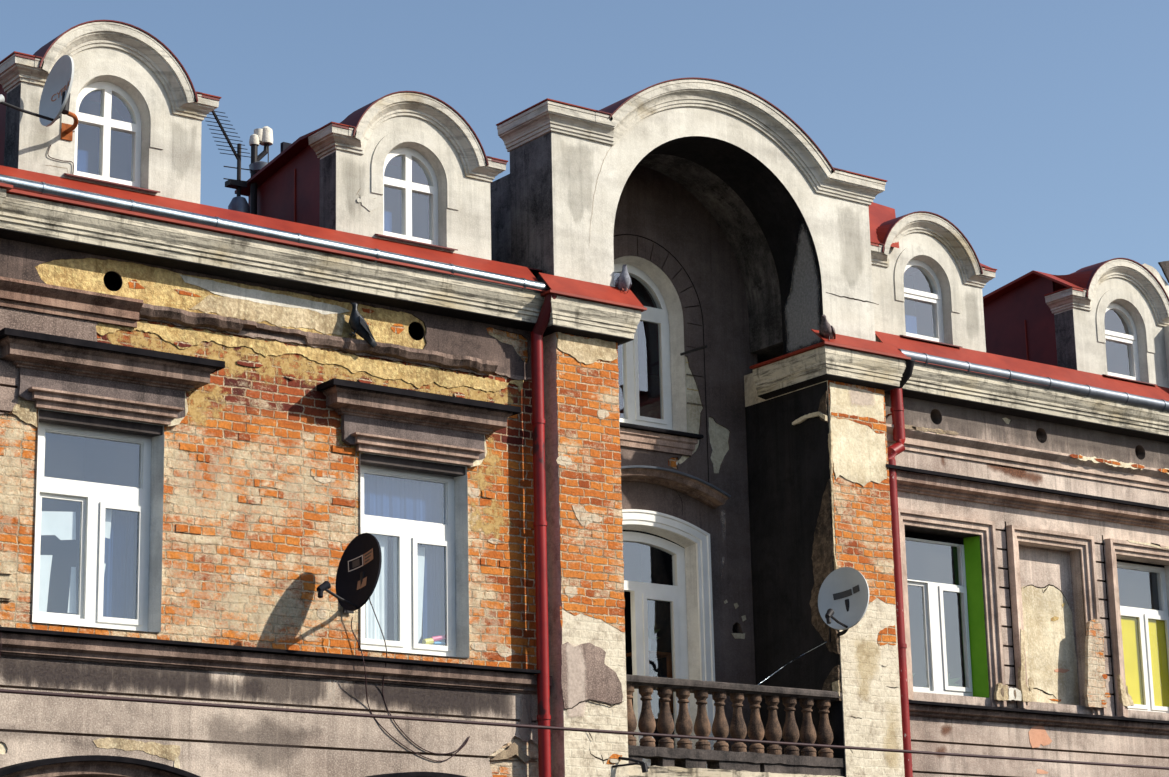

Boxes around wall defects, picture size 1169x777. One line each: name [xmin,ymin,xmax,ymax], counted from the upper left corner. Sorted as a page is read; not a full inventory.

flaking render [0,258,537,675]
flaking render [556,332,625,632]
peeling [668,356,729,473]
flaking render [792,380,896,703]
flaking render [1070,454,1169,473]
leakage [0,655,532,742]
peeling [1001,585,1079,705]